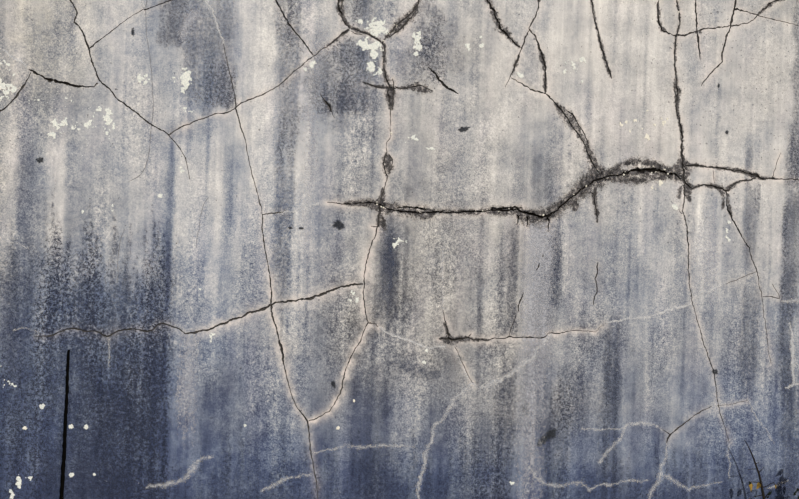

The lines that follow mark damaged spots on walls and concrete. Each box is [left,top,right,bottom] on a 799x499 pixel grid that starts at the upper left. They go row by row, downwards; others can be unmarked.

peeling [0,60,19,102]
water stain [159,0,235,109]
crack [0,0,433,210]
water stain [307,33,374,132]
peeling [356,17,389,76]
peeling [412,31,422,56]
water stain [399,3,445,82]
water stain [0,219,189,499]
crack [35,203,363,389]
water stain [314,219,643,499]
crack [290,0,799,483]
water stain [667,106,799,499]